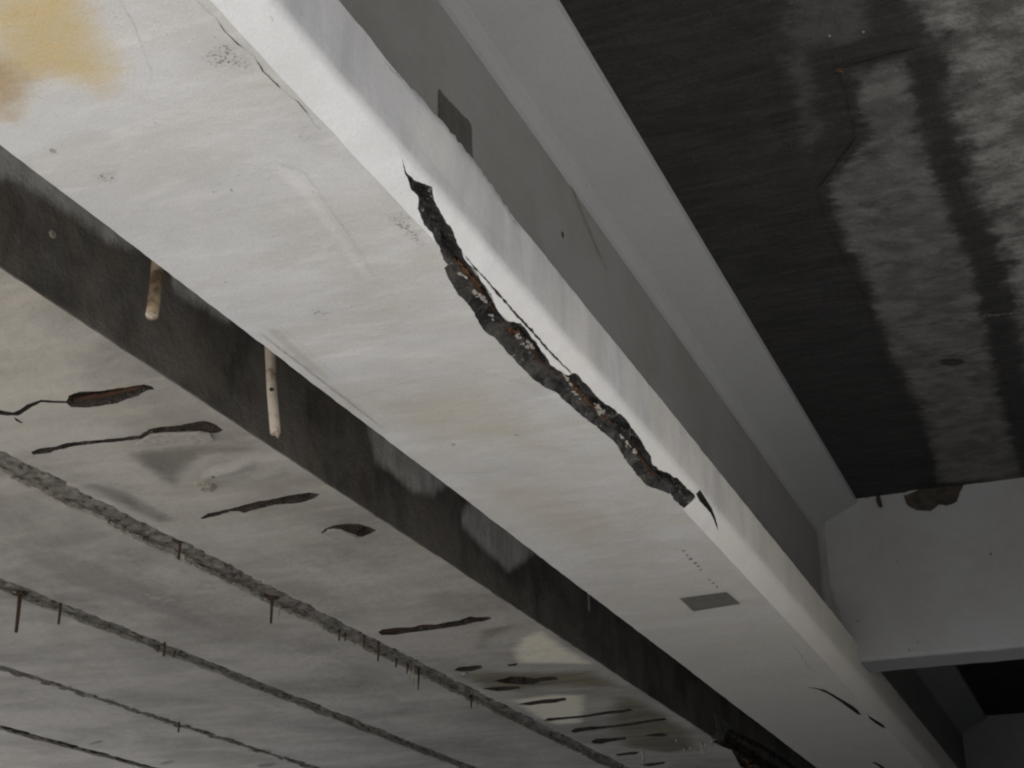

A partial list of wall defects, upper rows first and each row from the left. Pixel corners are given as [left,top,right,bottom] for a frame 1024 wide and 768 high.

water stain [894,0,1024,415]
spalling [398,146,695,508]
spalling [66,385,154,408]
spalling [31,421,223,455]
spalling [201,492,320,519]
peeling [904,485,963,511]
spalling [321,524,377,540]
spalling [379,617,492,635]
spalling [455,665,483,676]
spalling [483,663,558,691]
crack [792,644,886,728]
spalling [544,708,668,766]